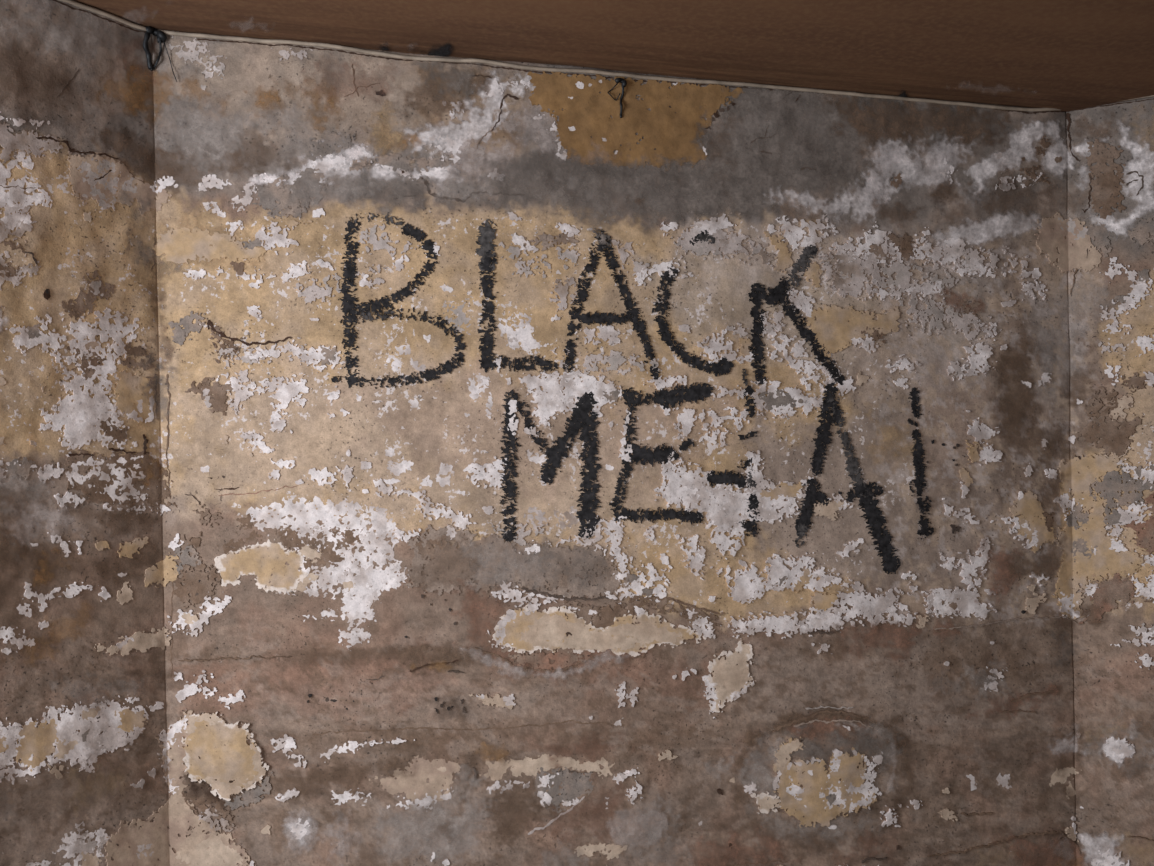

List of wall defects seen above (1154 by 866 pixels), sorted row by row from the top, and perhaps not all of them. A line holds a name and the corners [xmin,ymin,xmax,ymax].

damp [0,111,50,127]
crack [52,0,826,148]
damp [91,62,1105,249]
peeling [527,71,744,172]
crack [979,98,1154,213]
damp [1092,127,1154,235]
flaking render [0,121,1154,719]
peeling [0,670,461,866]
damp [285,817,317,844]
flaking render [480,752,643,836]
peeling [729,737,923,830]
damp [1099,718,1154,766]